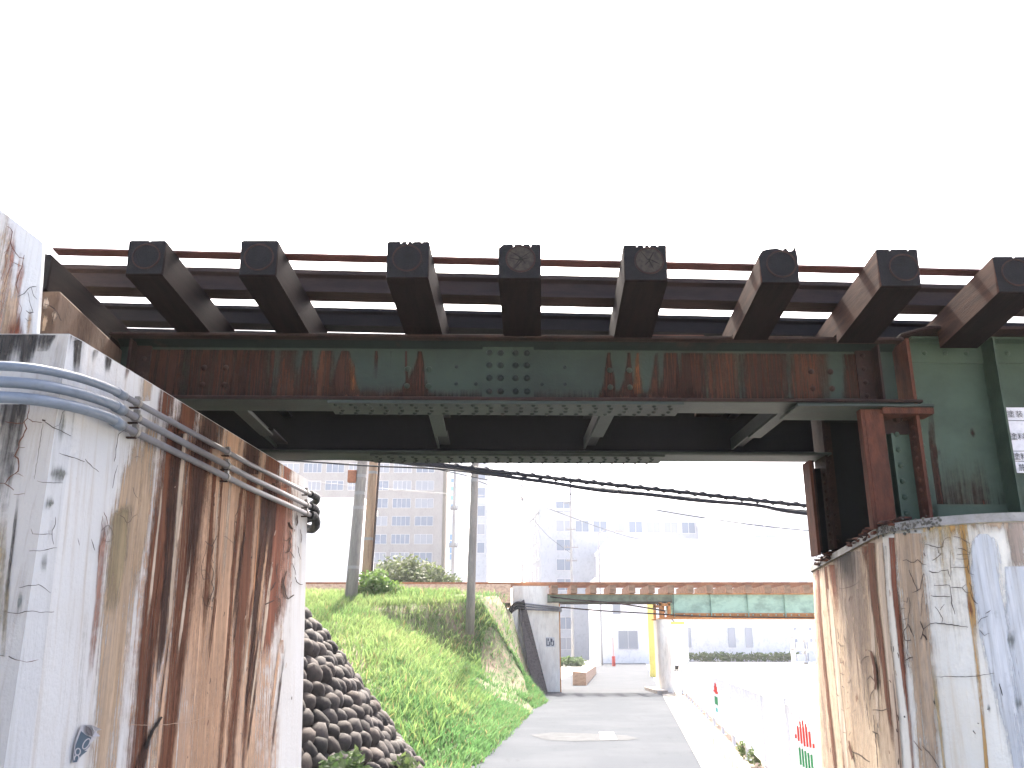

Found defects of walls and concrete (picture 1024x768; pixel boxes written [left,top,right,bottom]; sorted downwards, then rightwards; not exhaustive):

damp [0,515,22,629]
damp [0,404,27,483]
crack [0,411,141,562]
rust [130,349,482,768]
rust [600,353,704,398]
rust [812,551,845,768]
rust [846,516,914,768]
crack [901,531,991,667]